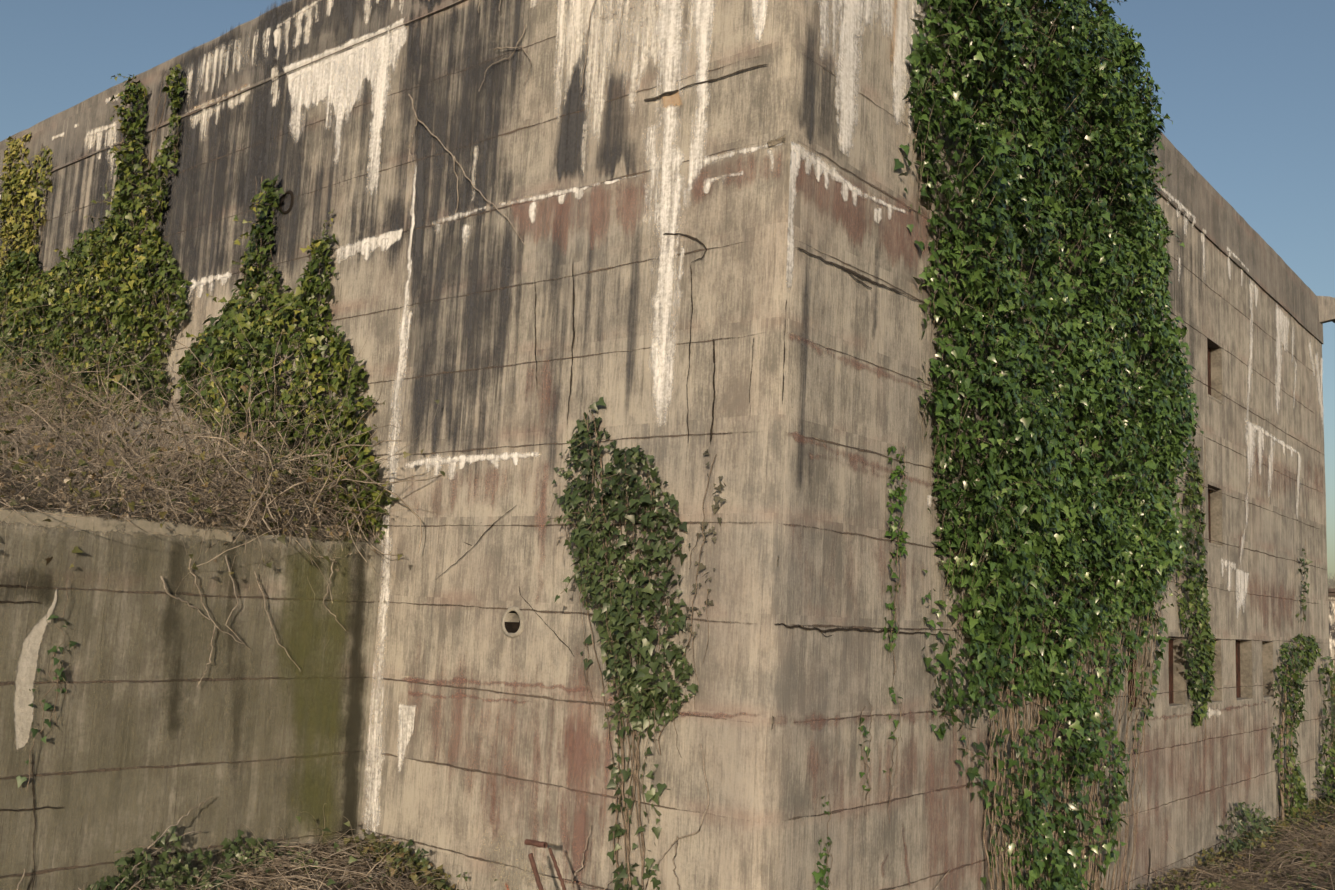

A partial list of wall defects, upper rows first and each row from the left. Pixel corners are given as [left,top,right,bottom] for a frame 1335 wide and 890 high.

damp [0,0,945,831]
damp [1221,247,1301,619]
damp [1276,305,1324,425]
peeling [13,589,57,750]
corrosion [404,678,584,756]